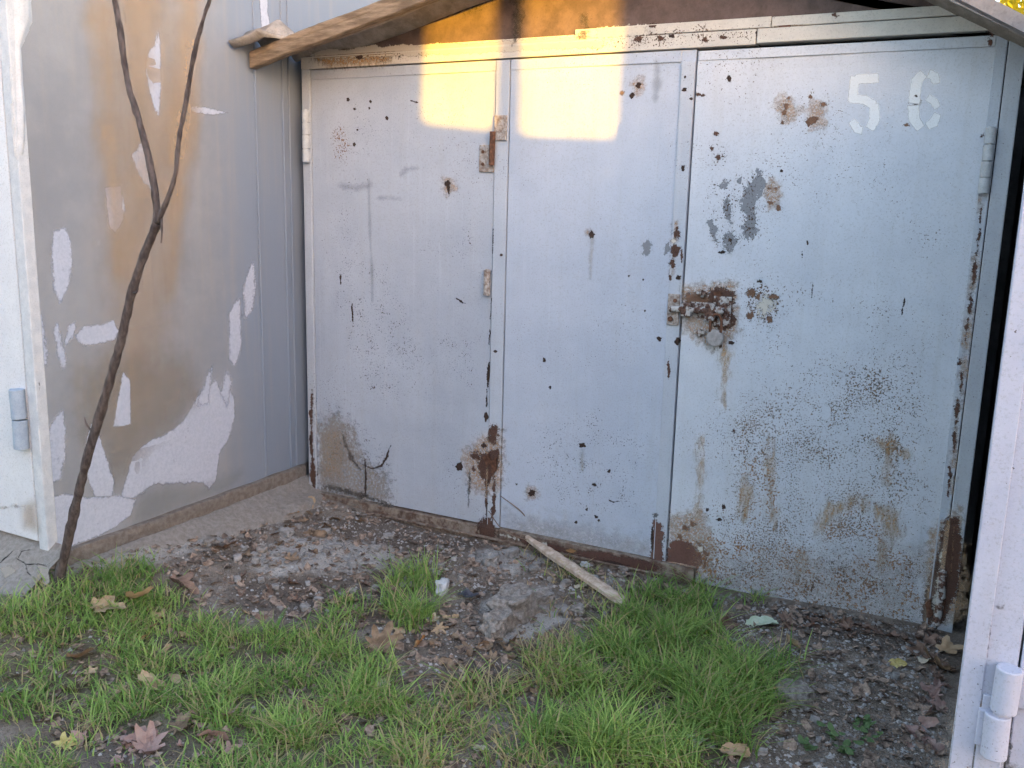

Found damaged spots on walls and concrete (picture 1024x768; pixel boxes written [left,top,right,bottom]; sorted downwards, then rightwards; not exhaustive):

rust [776,94,827,127]
peeling [706,169,767,254]
rust [682,279,779,376]
rust [455,337,967,626]